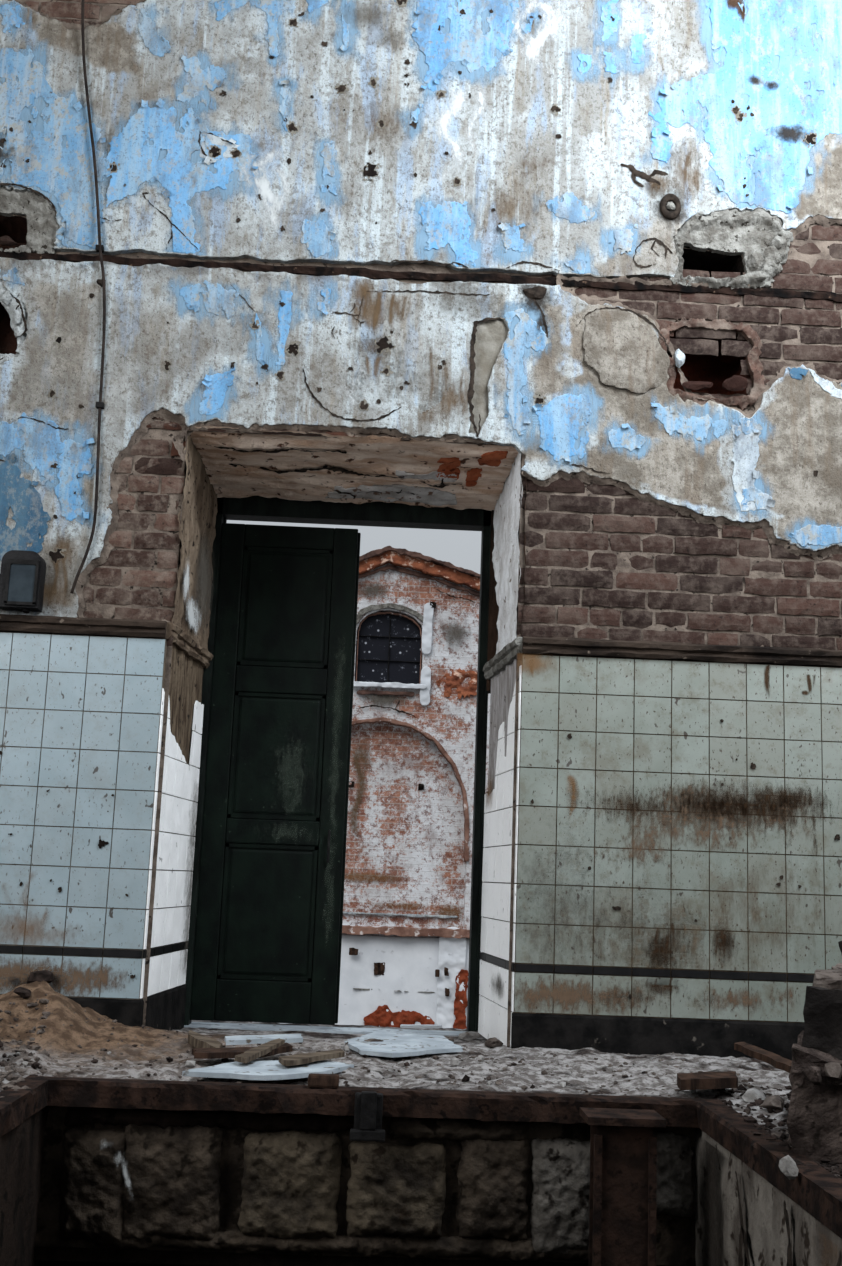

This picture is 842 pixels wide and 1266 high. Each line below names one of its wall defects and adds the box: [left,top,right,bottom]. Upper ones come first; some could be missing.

flaking render [0,0,842,768]
spalling [436,654,522,795]
corrosion [603,783,827,863]